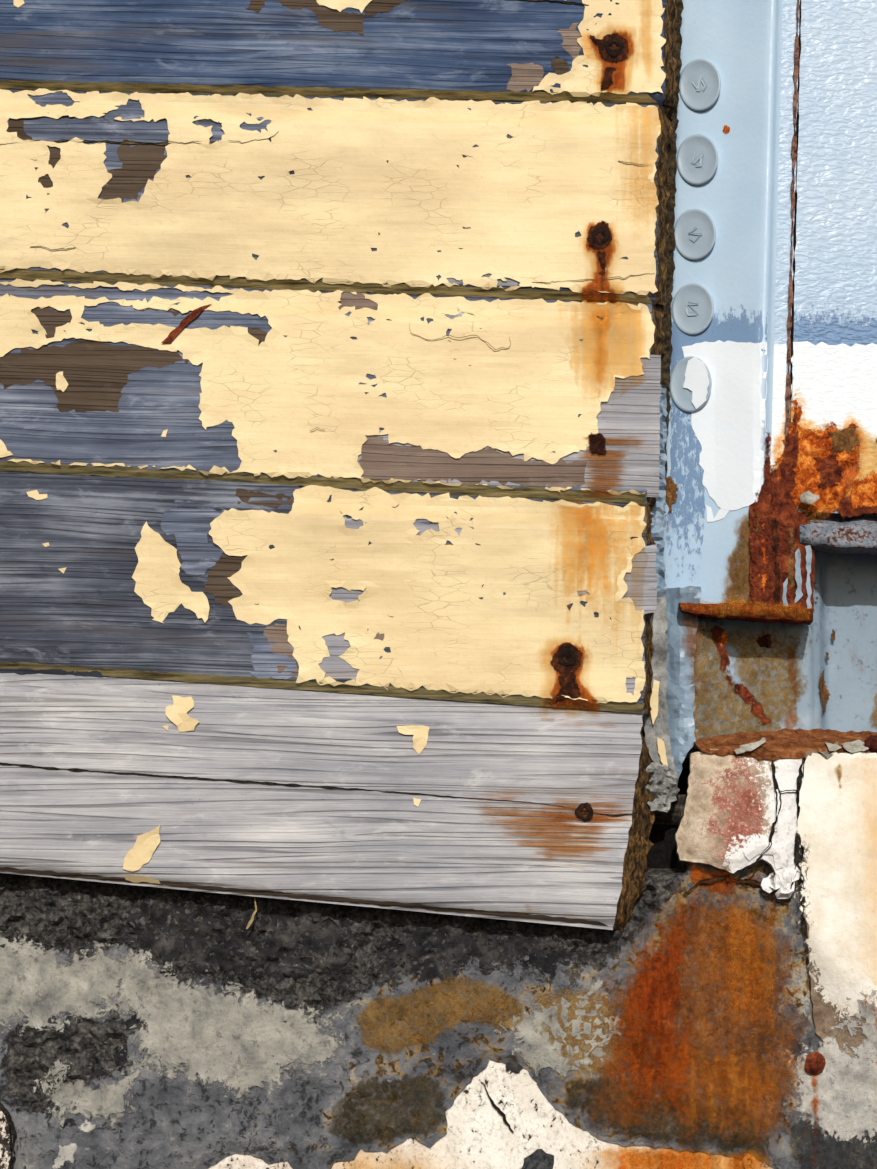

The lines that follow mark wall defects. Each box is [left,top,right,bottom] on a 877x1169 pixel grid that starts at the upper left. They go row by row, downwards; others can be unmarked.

corrosion [590,33,632,90]
peeling [0,0,591,203]
corrosion [582,221,616,300]
peeling [357,355,661,497]
peeling [0,279,299,680]
corrosion [735,394,877,612]
peeling [319,633,359,682]
corrosion [550,642,596,708]
corrosion [864,735,877,753]
spalling [0,749,877,1169]
crack [0,1102,17,1169]
crack [481,1082,514,1133]